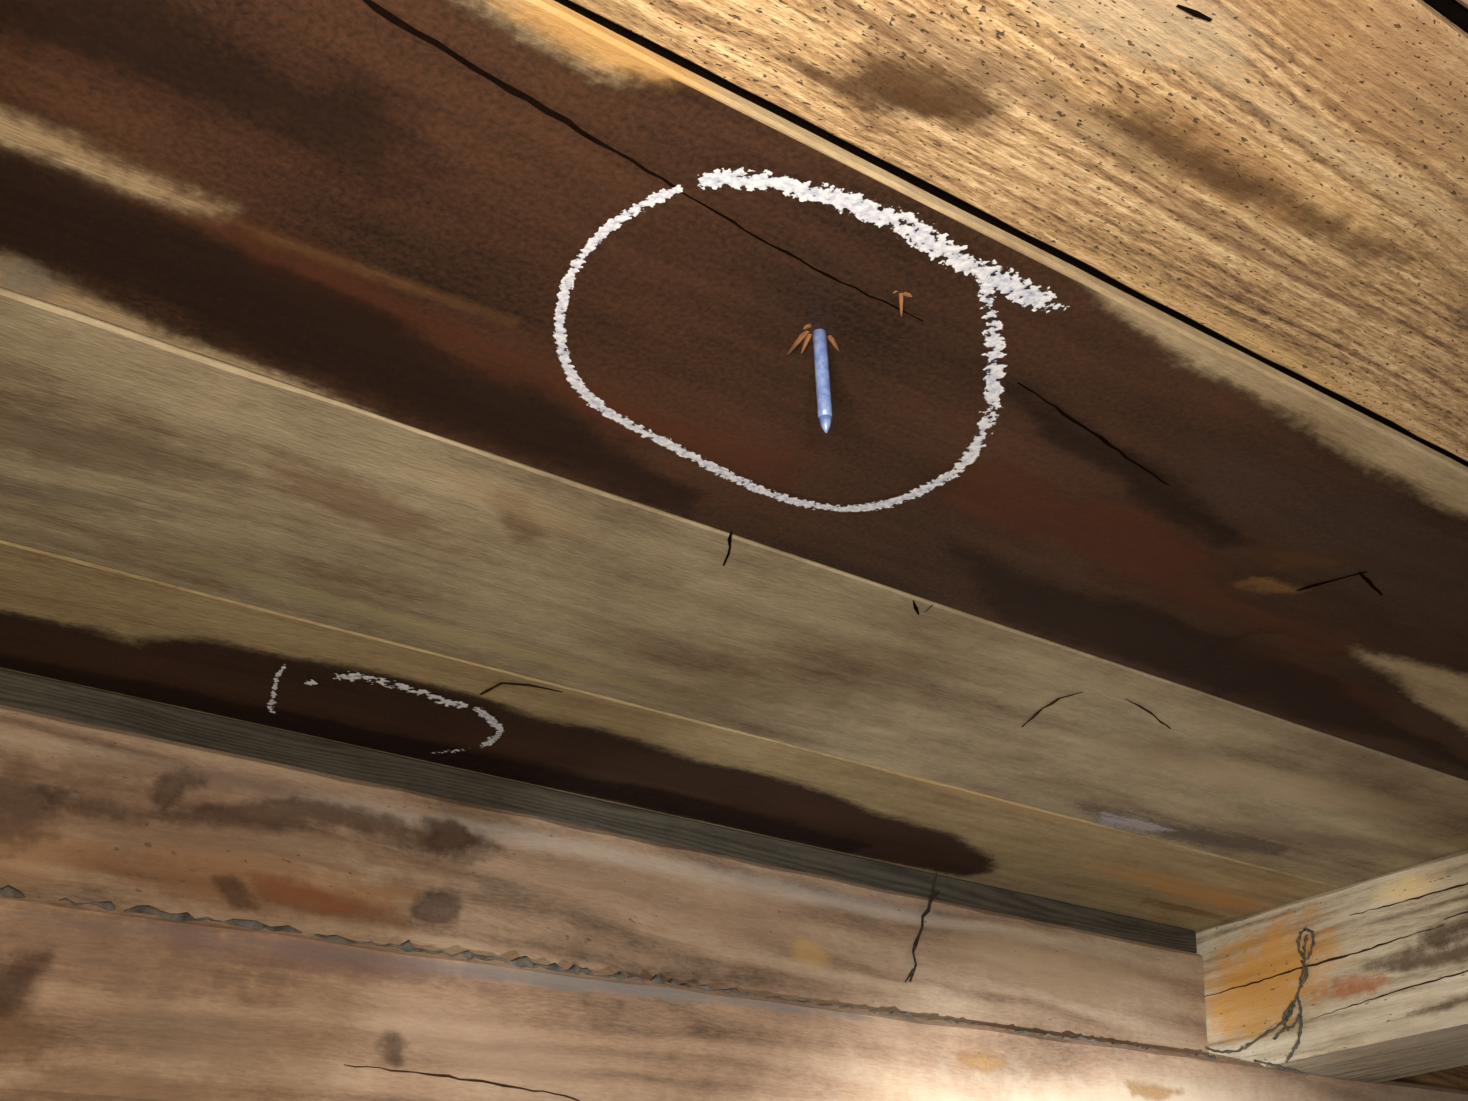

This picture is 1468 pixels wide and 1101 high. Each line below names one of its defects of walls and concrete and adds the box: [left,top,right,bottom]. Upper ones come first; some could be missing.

crack [363,0,923,321]
damp [0,0,1468,781]
crack [1017,382,1170,486]
damp [0,612,993,876]
crack [1022,692,1082,727]
crack [1126,699,1171,729]
crack [905,872,940,983]
crack [1205,883,1468,997]
crack [1313,970,1468,1019]
damp [1369,920,1468,971]
damp [1428,998,1468,1010]
crack [344,1064,580,1101]